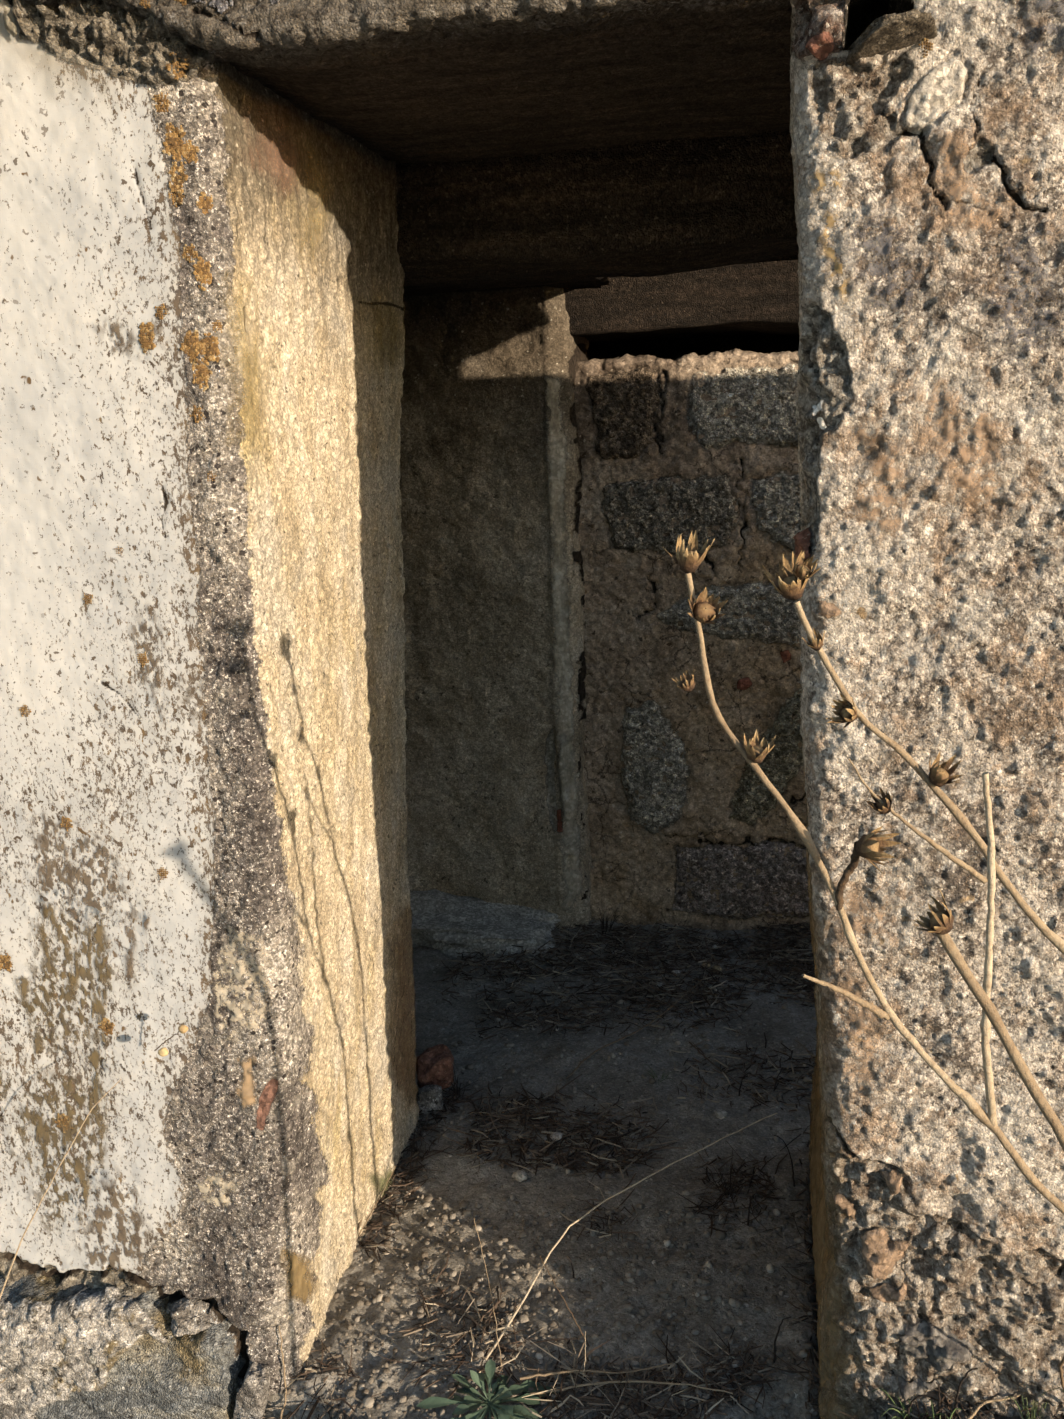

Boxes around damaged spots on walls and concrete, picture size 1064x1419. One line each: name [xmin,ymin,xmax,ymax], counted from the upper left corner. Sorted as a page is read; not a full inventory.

spalling [791,0,967,160]
crack [901,80,1046,231]
peeling [0,0,331,1402]